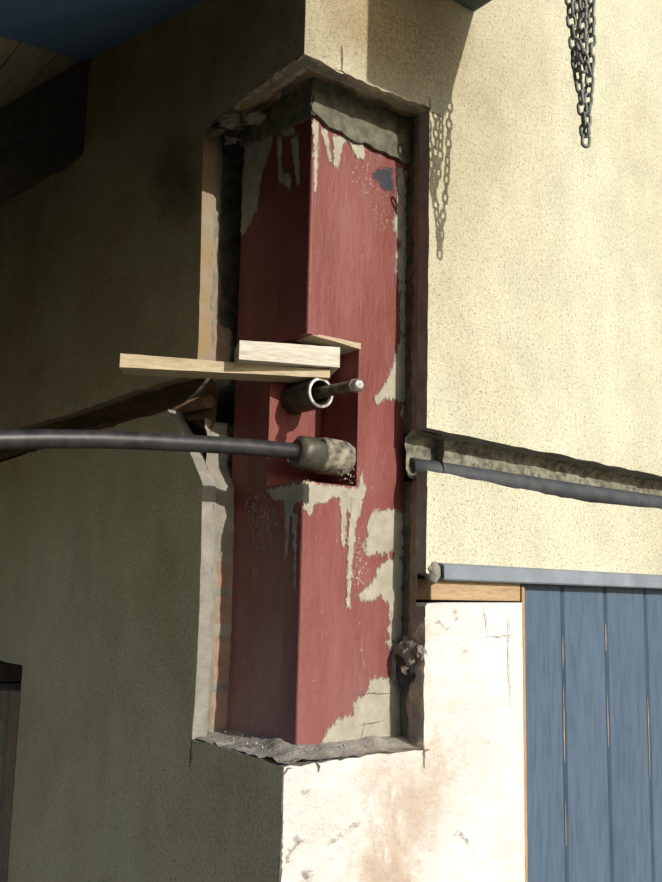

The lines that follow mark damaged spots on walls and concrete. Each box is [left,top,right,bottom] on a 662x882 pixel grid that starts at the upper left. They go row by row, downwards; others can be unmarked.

peeling [208,109,275,236]
peeling [375,167,408,424]
peeling [322,508,428,743]